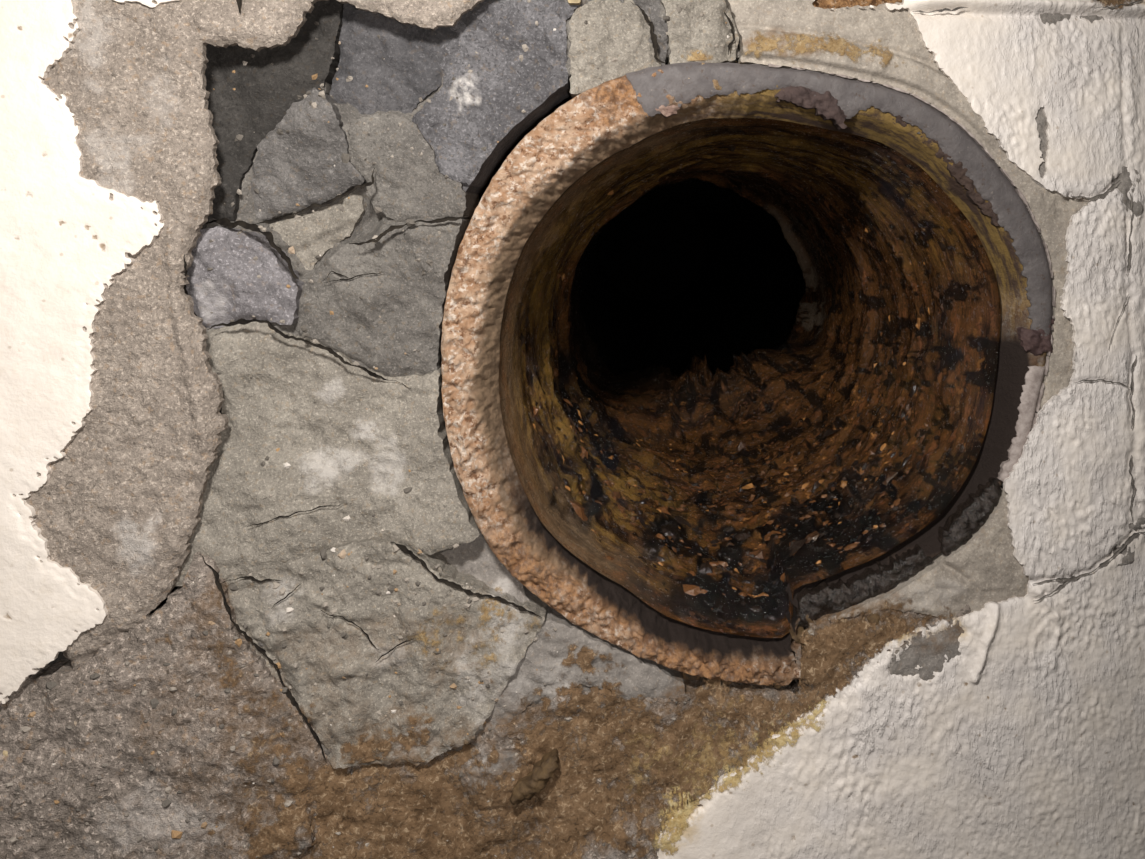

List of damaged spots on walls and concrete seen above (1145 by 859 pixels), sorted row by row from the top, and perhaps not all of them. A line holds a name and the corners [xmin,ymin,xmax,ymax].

spalling [812,0,902,9]
peeling [1031,107,1048,187]
crack [205,168,383,283]
crack [183,254,411,389]
crack [202,556,326,759]
spalling [0,0,832,859]
crack [391,542,542,618]
rust [473,587,511,664]
peeling [789,544,971,683]
peeling [937,477,1003,556]
crack [1034,359,1145,601]
rust [207,600,953,859]